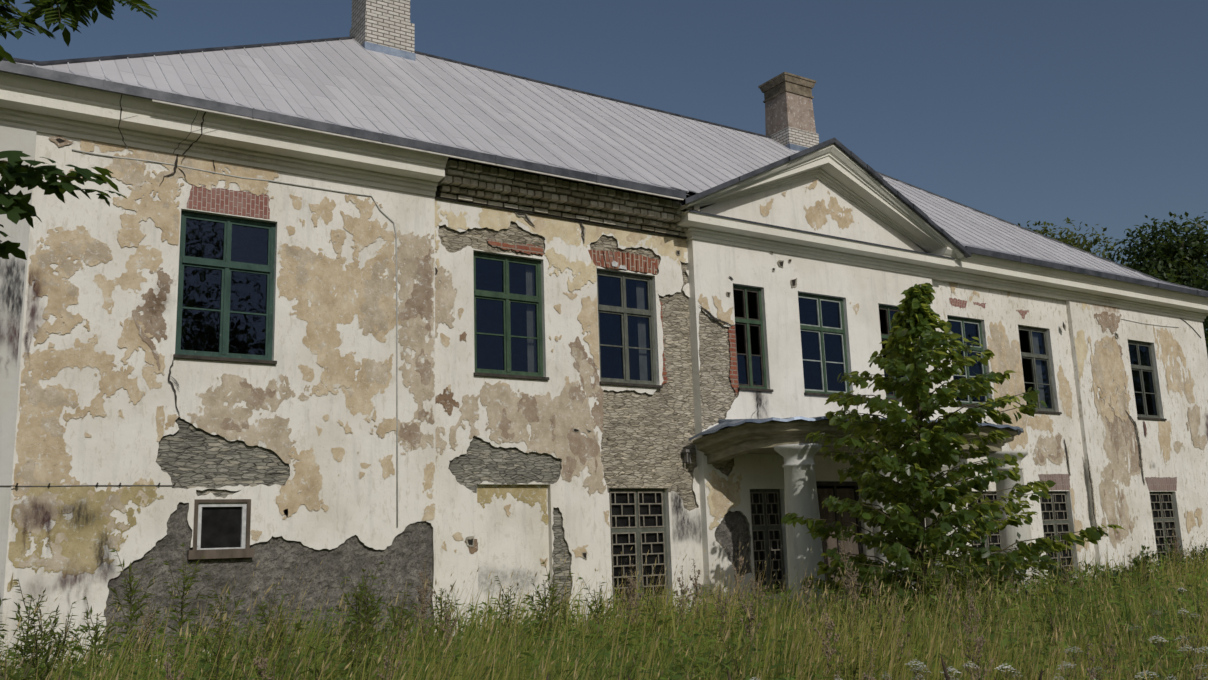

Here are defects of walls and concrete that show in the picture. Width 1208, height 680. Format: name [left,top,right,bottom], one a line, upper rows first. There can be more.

crack [118,95,134,146]
crack [159,111,215,186]
crack [135,319,180,416]
spalling [7,135,752,655]
peeling [948,282,1207,552]